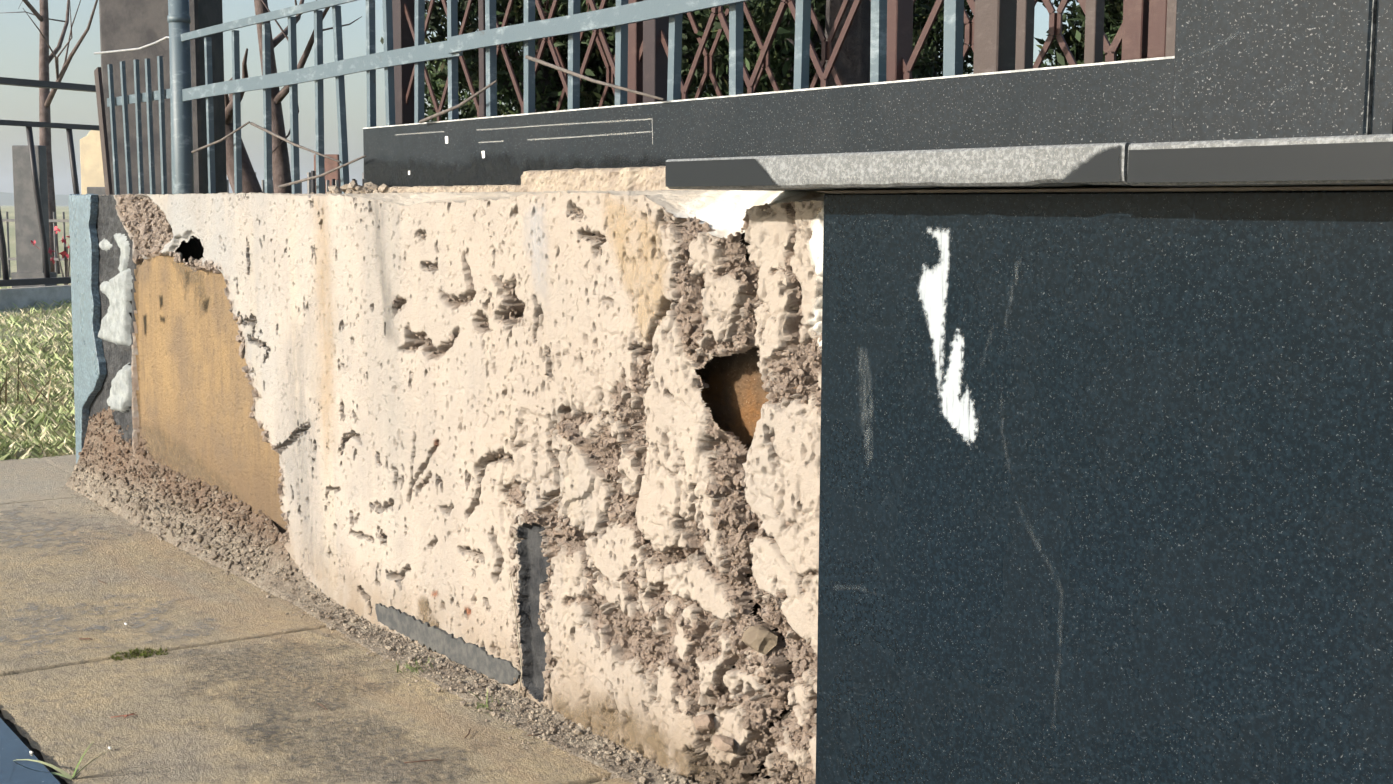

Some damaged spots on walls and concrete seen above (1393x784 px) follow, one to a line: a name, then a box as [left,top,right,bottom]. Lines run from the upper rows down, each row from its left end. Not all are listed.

peeling [113,194,311,547]
spalling [441,200,824,784]
crack [549,418,818,784]
crack [641,228,760,383]
crack [786,203,796,221]
crack [792,276,817,396]